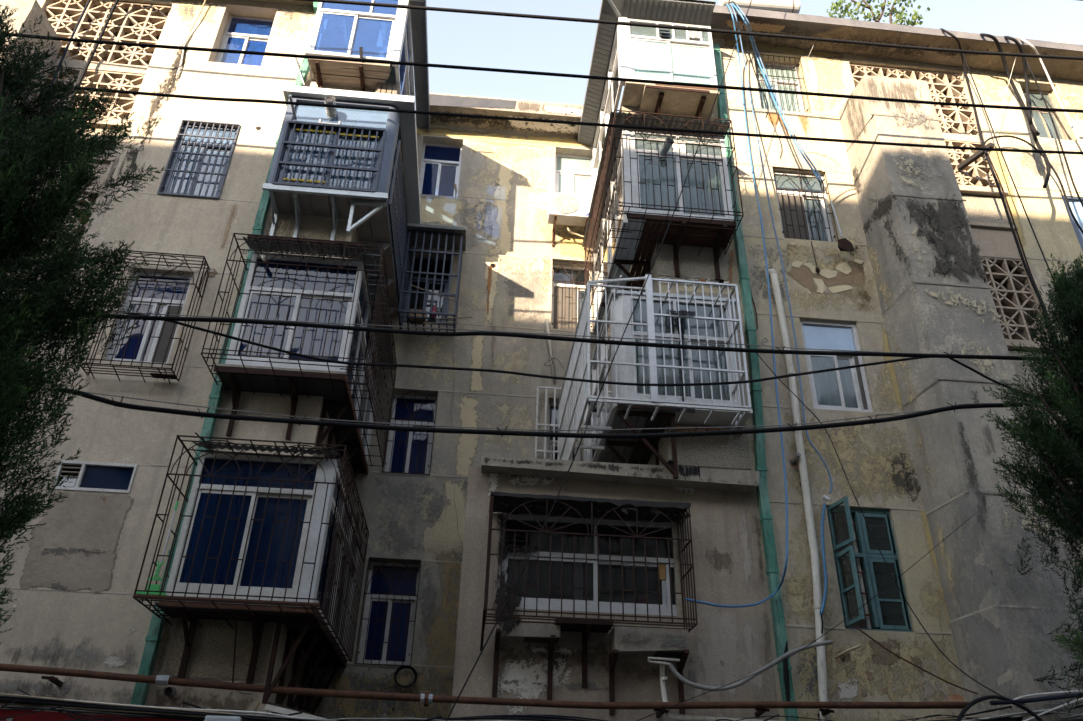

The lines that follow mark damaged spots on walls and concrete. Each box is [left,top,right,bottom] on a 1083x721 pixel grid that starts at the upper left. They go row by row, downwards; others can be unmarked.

damp [844,78,987,282]
flaking render [754,238,891,311]
peeling [399,128,594,681]
peeling [786,415,929,505]
mould [884,452,921,502]
peeling [784,516,831,623]
peeling [794,634,964,702]